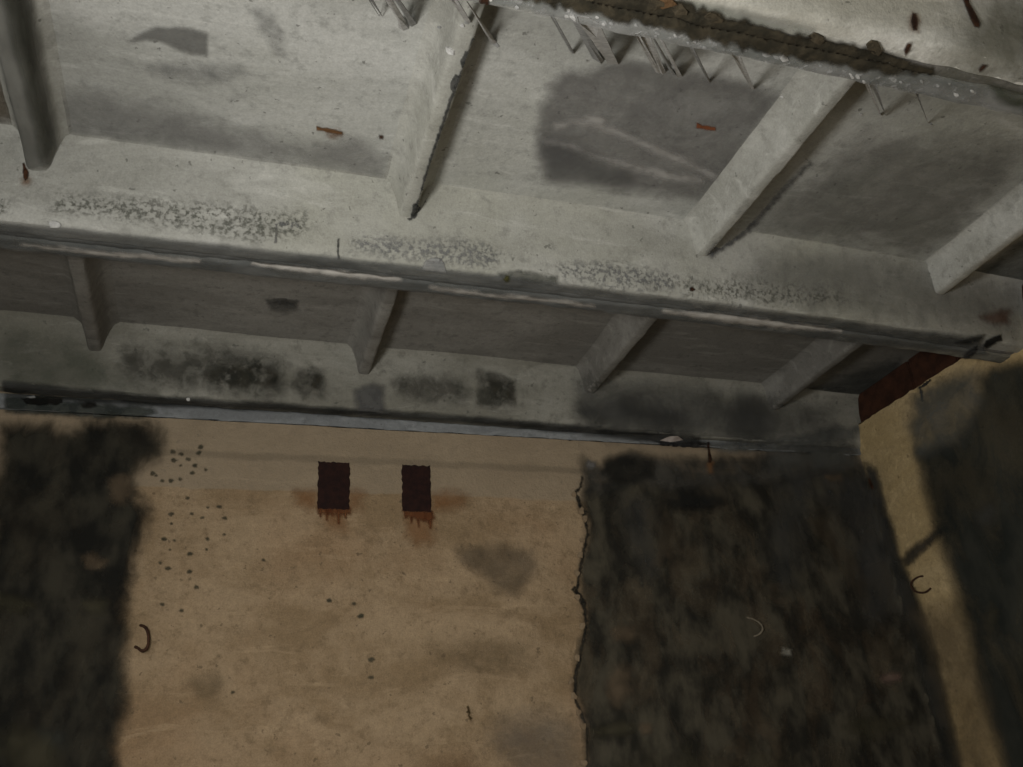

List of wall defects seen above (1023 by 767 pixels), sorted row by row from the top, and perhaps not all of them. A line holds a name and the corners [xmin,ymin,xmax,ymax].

peeling [369,0,417,31]
corrosion [963,0,980,27]
water stain [136,28,206,54]
spalling [504,0,986,126]
water stain [541,65,774,195]
water stain [125,350,283,391]